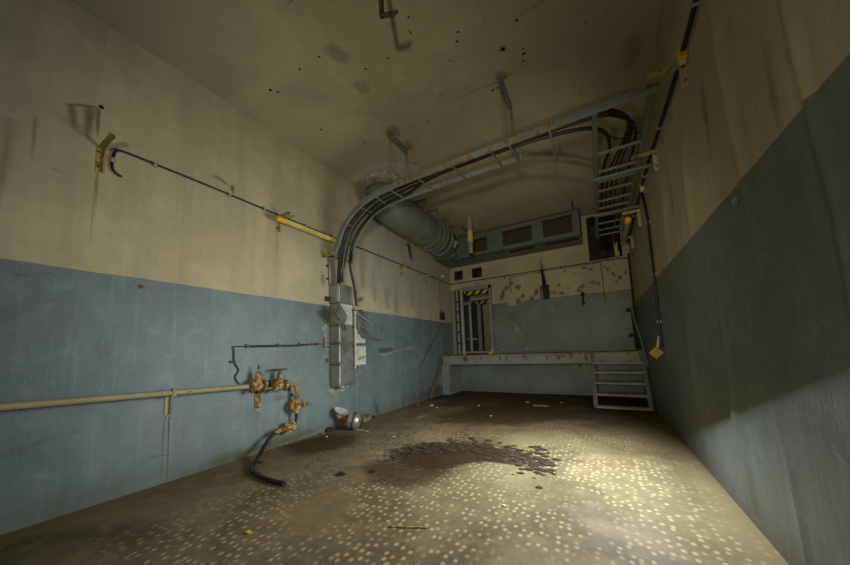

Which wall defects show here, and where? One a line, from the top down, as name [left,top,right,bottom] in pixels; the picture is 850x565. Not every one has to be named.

leakage [366,441,519,485]